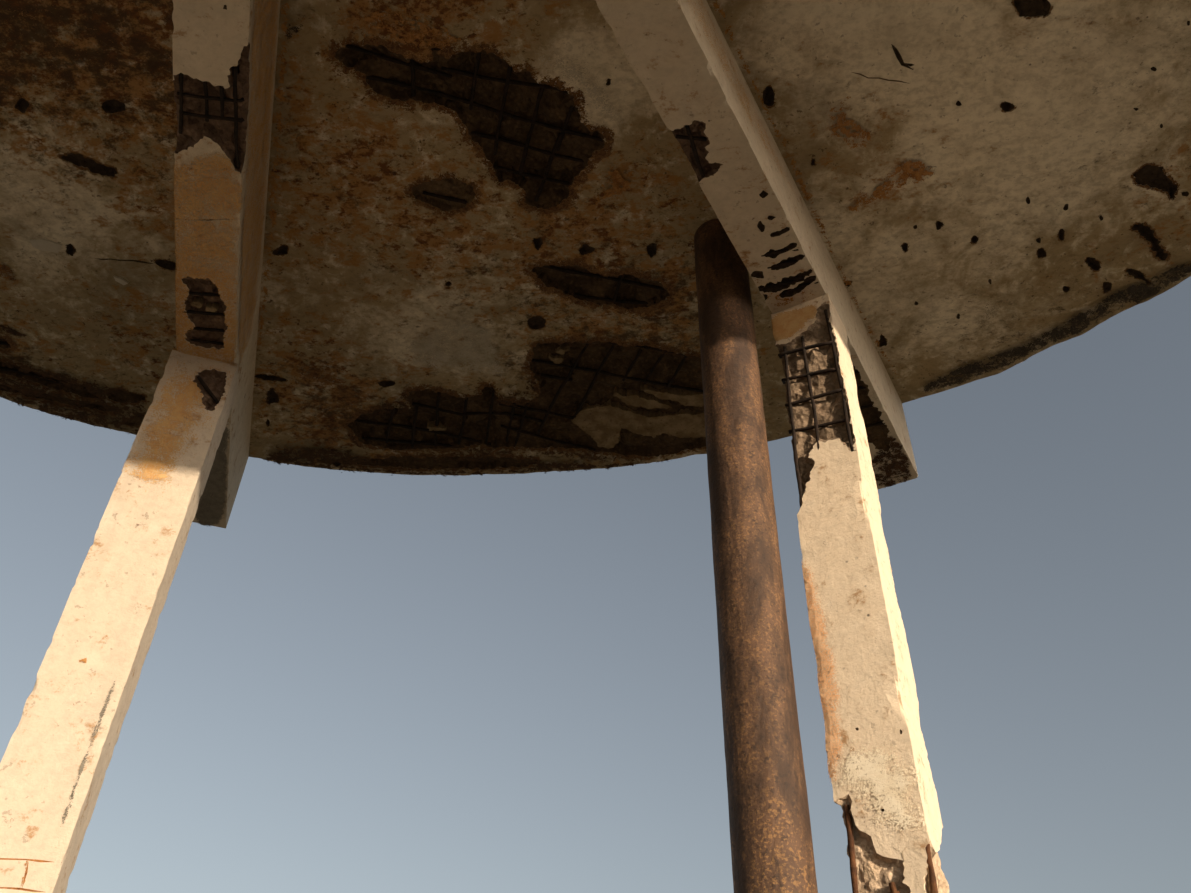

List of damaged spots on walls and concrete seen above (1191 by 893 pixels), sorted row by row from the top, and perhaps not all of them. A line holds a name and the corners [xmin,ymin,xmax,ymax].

spalling [173,42,250,173]
spalling [326,32,615,217]
spalling [153,258,228,349]
spalling [523,237,678,316]
spalling [751,215,818,300]
leakage [0,359,146,434]
spalling [332,315,707,474]
spalling [776,302,891,507]
crack [0,858,52,892]
spalling [834,794,950,893]